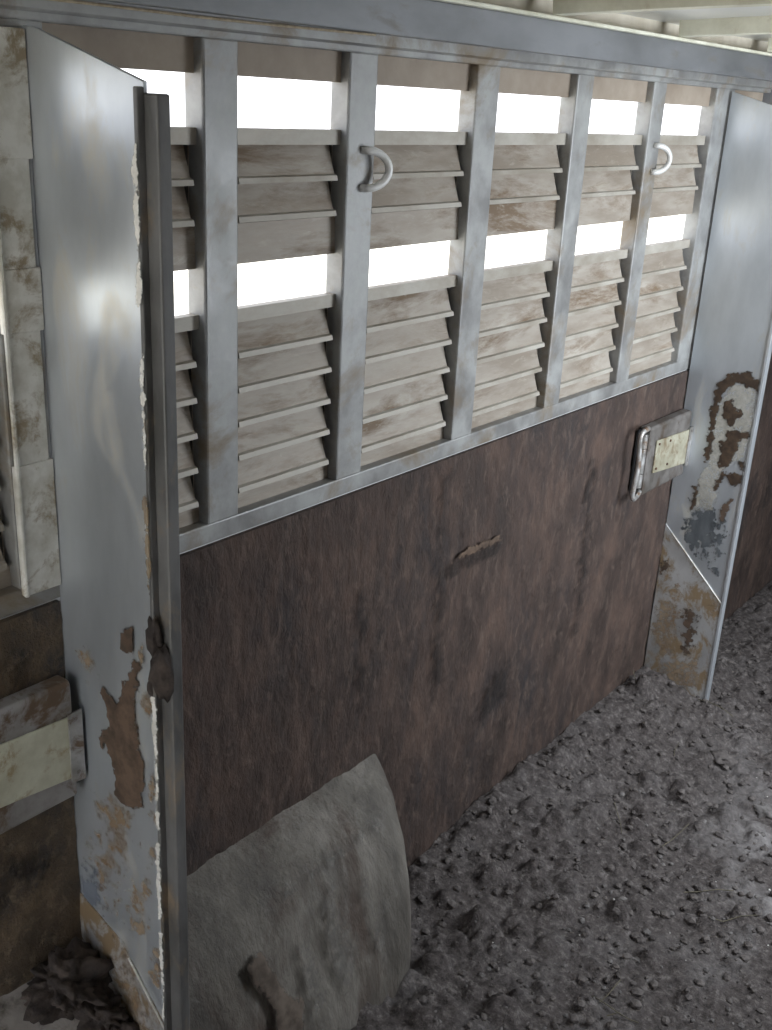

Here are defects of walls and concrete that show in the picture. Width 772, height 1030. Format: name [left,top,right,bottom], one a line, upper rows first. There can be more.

peeling [688,371,759,522]
peeling [120,627,143,664]
corrosion [650,584,701,688]
corrosion [90,798,151,935]